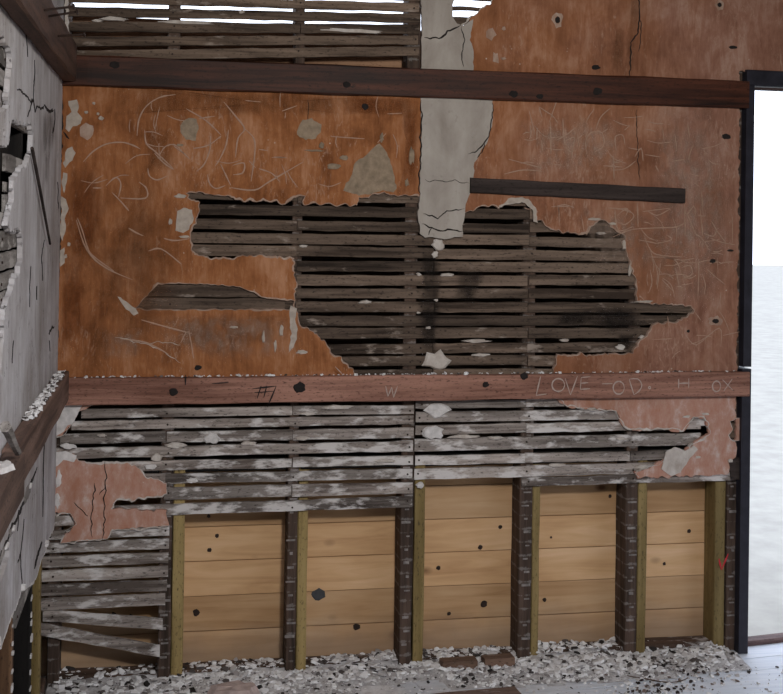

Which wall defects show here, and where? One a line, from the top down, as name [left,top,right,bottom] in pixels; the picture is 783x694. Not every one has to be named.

flaking render [0,30,33,377]
crack [17,35,69,163]
crack [29,182,62,307]
flaking render [117,133,695,375]
crack [418,103,468,194]
crack [424,25,465,67]
crack [424,208,465,233]
flaking render [452,0,492,25]
crack [469,103,494,158]
crack [0,444,45,583]
crack [75,459,107,539]
flaking render [0,399,740,657]